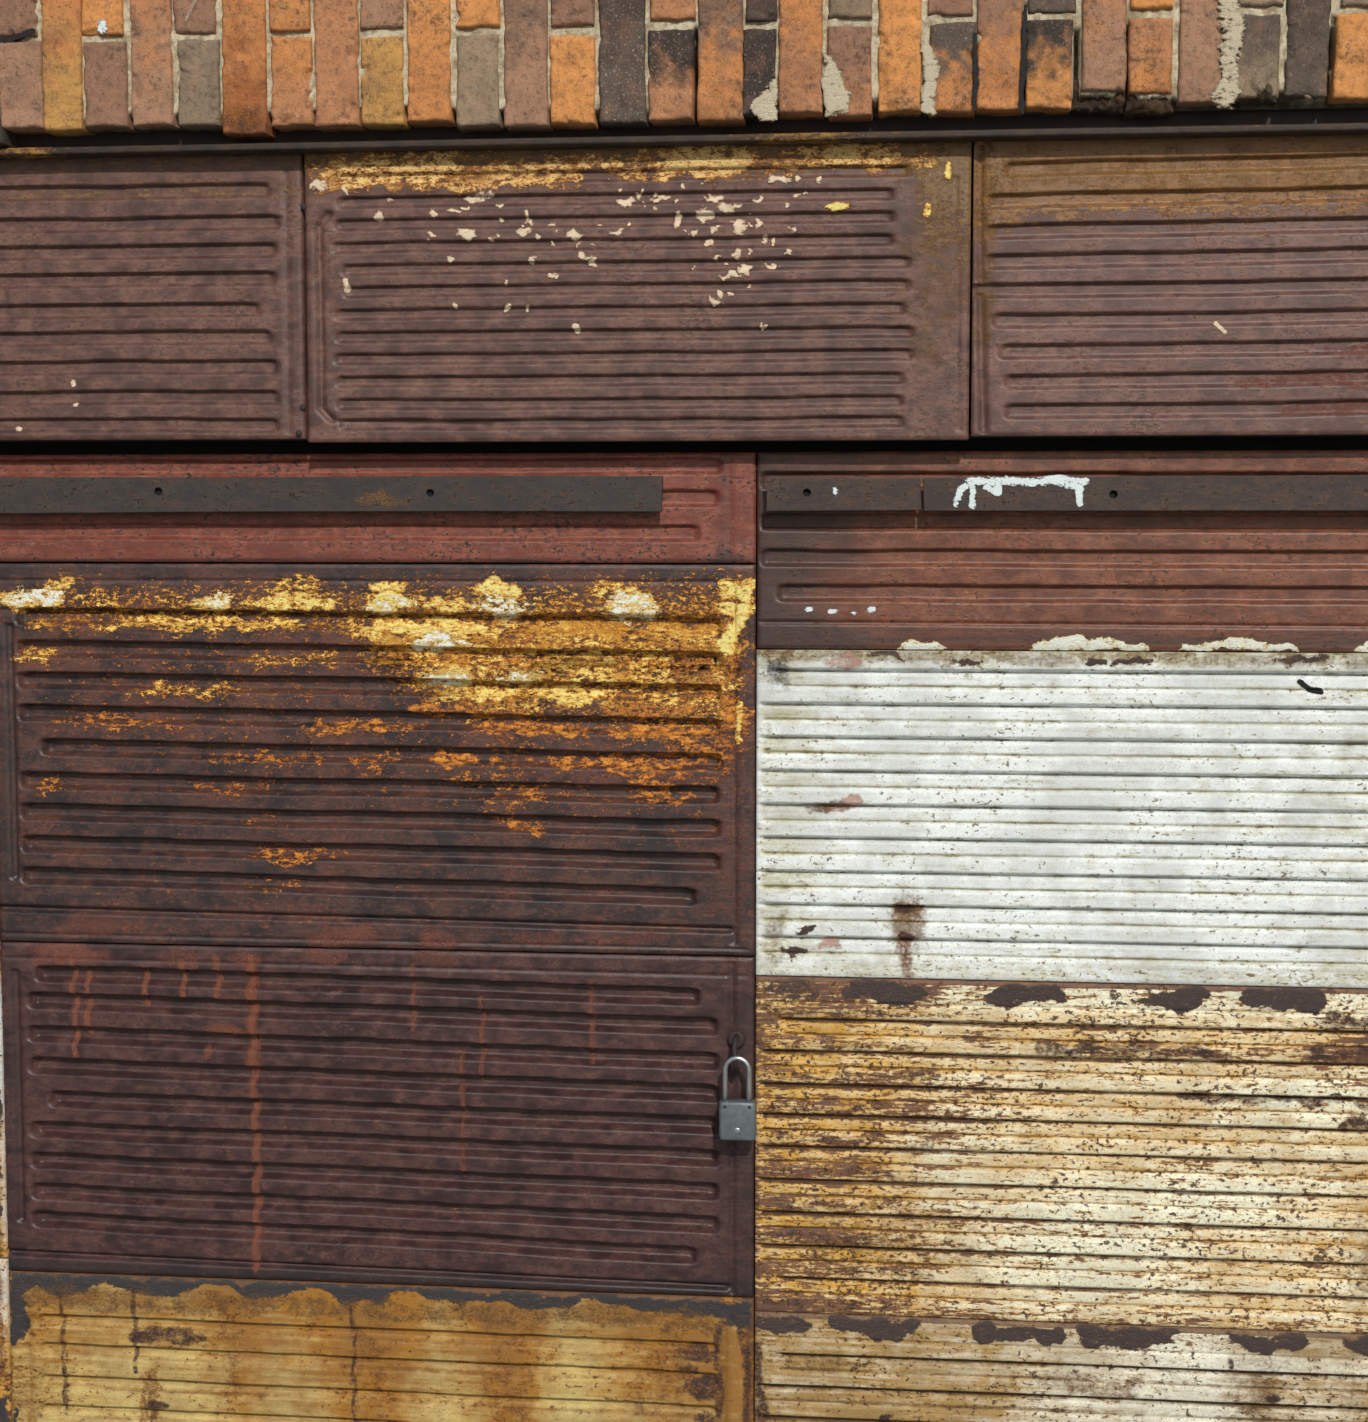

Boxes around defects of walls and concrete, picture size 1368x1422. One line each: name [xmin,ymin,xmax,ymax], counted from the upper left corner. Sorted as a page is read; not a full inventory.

peeling [309,179,348,195]
peeling [824,202,850,213]
peeling [426,173,822,307]
peeling [806,638,1014,667]
peeling [1029,634,1368,667]
peeling [0,565,788,898]
rust [893,902,924,977]
rust [1326,1011,1368,1029]
rust [1035,1040,1231,1061]
rust [1177,1090,1368,1130]
rust [128,1290,206,1422]
rust [648,1315,770,1422]